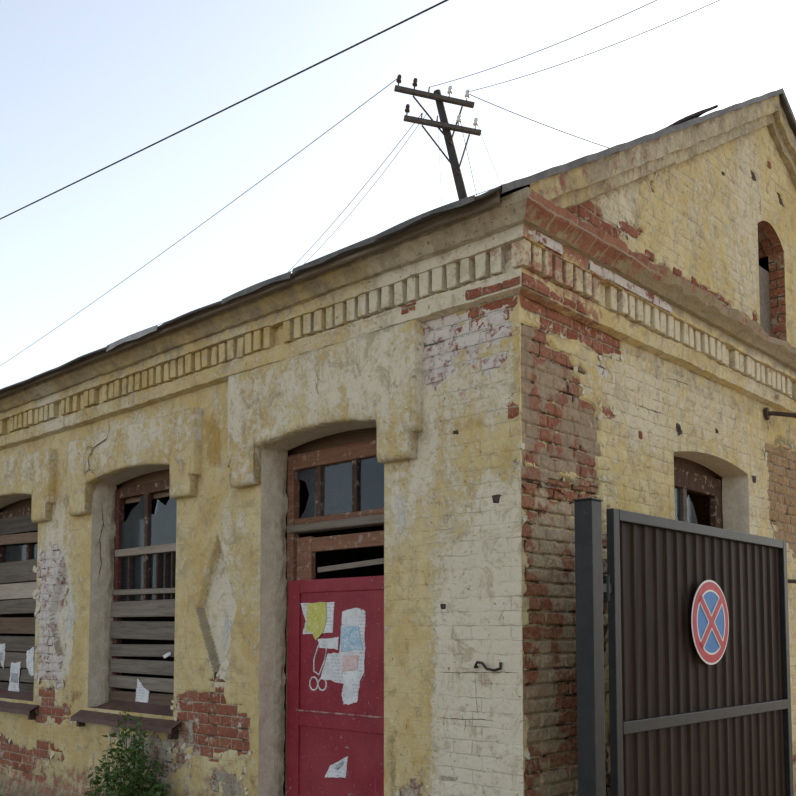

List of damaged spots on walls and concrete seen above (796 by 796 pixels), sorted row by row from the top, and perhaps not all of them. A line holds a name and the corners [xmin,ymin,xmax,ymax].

flaking render [567,200,643,240]
peeling [528,230,672,313]
flaking render [666,262,732,308]
spalling [423,273,626,796]
spalling [763,442,796,559]
peeling [32,544,73,725]
spalling [0,733,64,784]
spalling [108,673,252,796]
peeling [396,777,431,796]